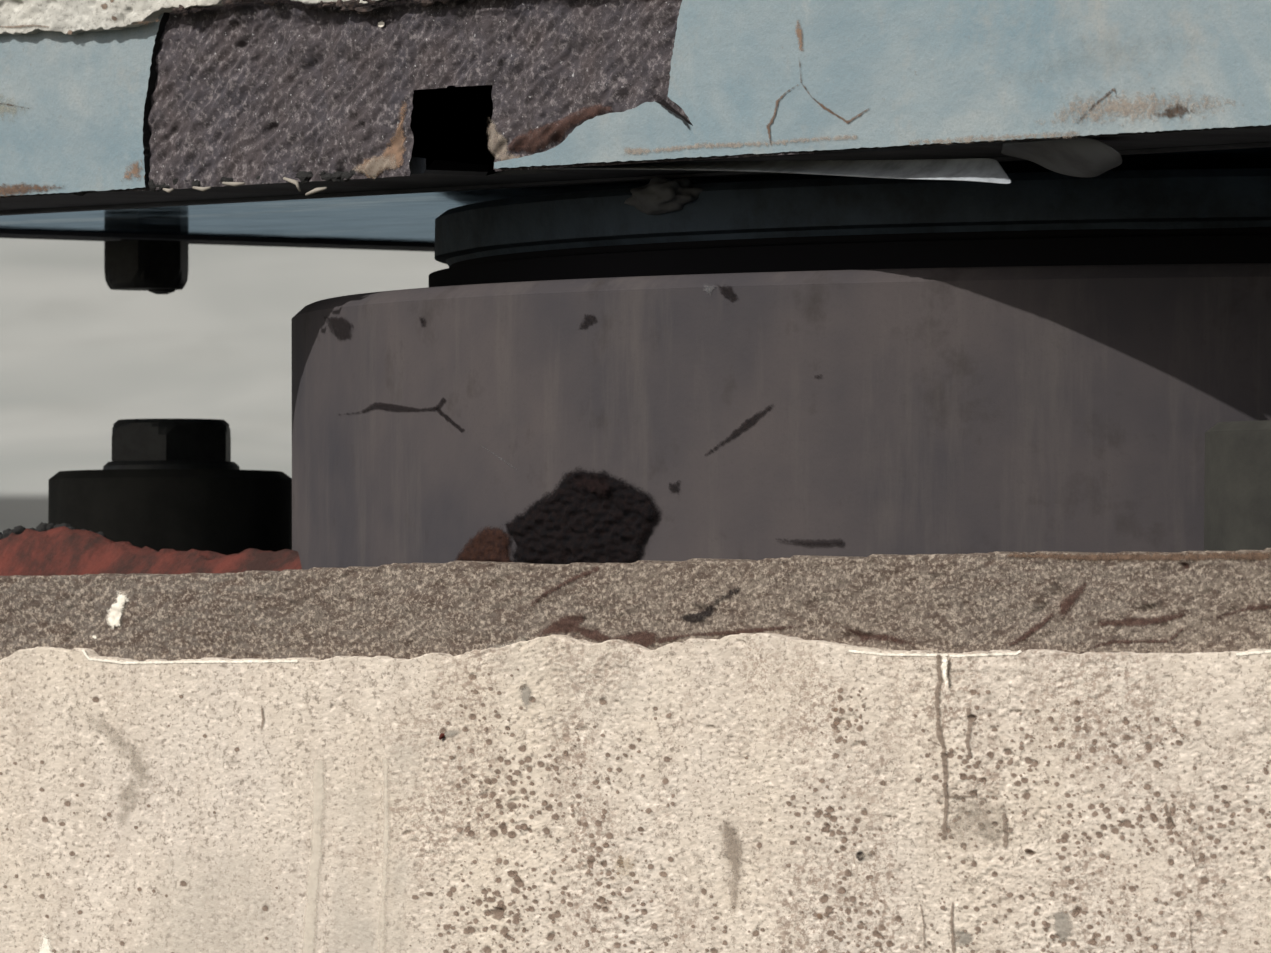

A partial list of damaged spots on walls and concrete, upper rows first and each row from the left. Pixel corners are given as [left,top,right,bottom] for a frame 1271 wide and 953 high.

peeling [126,0,1122,196]
crack [766,63,867,143]
crack [930,655,977,840]
crack [1001,813,1009,847]